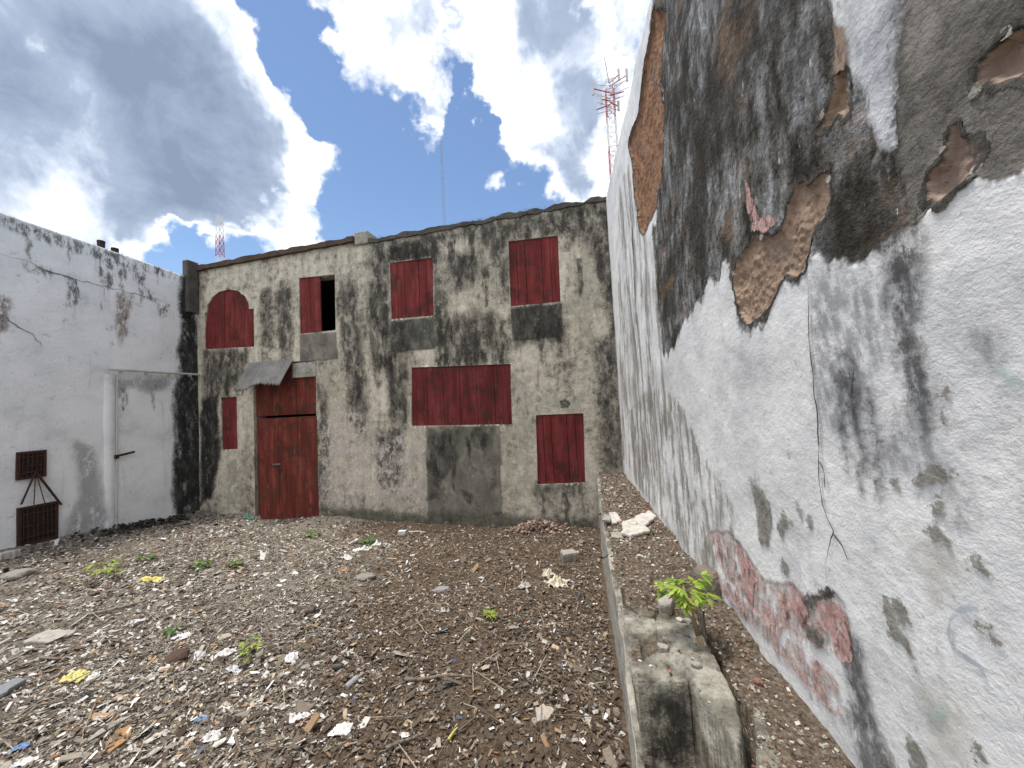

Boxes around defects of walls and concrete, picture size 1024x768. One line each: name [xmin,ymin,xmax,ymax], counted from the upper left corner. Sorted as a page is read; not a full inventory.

crack [2,254,174,304]
damp [2,218,248,515]
damp [259,284,294,361]
damp [317,391,597,528]
damp [337,203,621,490]
peeling [618,1,854,720]
damp [650,0,951,495]
crack [807,280,848,579]
peeling [886,0,1024,227]